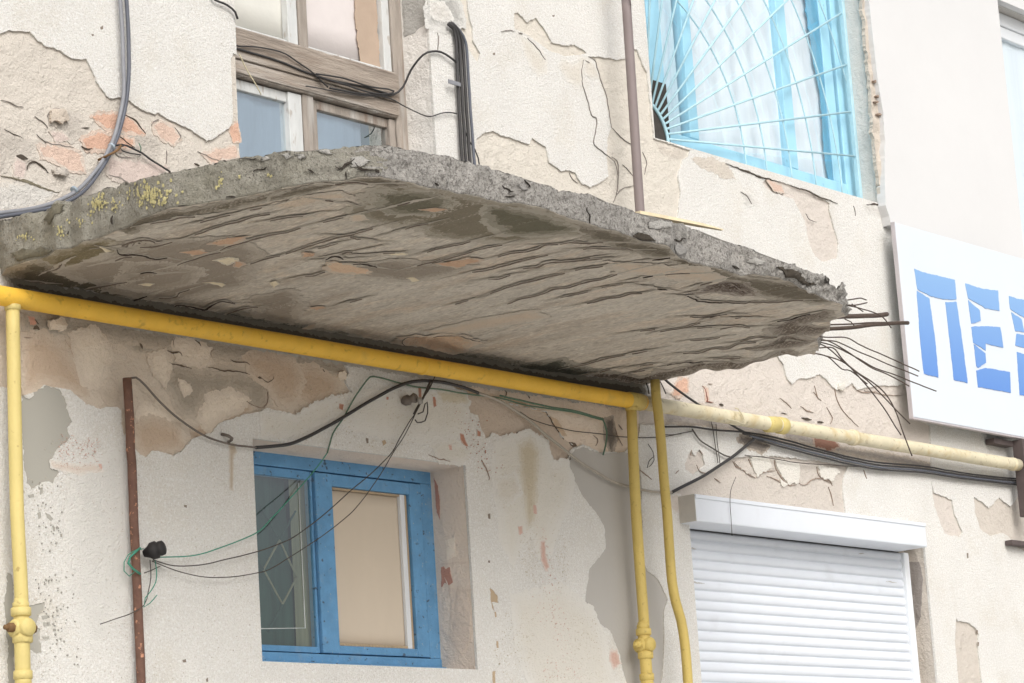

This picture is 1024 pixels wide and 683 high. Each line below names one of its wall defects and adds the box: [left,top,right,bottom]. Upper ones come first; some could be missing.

peeling [21,386,72,552]
flaking render [0,31,241,212]
flaking render [78,342,200,455]
crack [167,337,274,408]
crack [85,158,395,315]
crack [417,207,810,403]
crack [581,57,647,202]
flaking render [592,297,936,513]
spalling [776,267,816,286]
flaking render [762,179,837,262]
crack [725,163,878,222]
flaking render [974,497,1024,551]